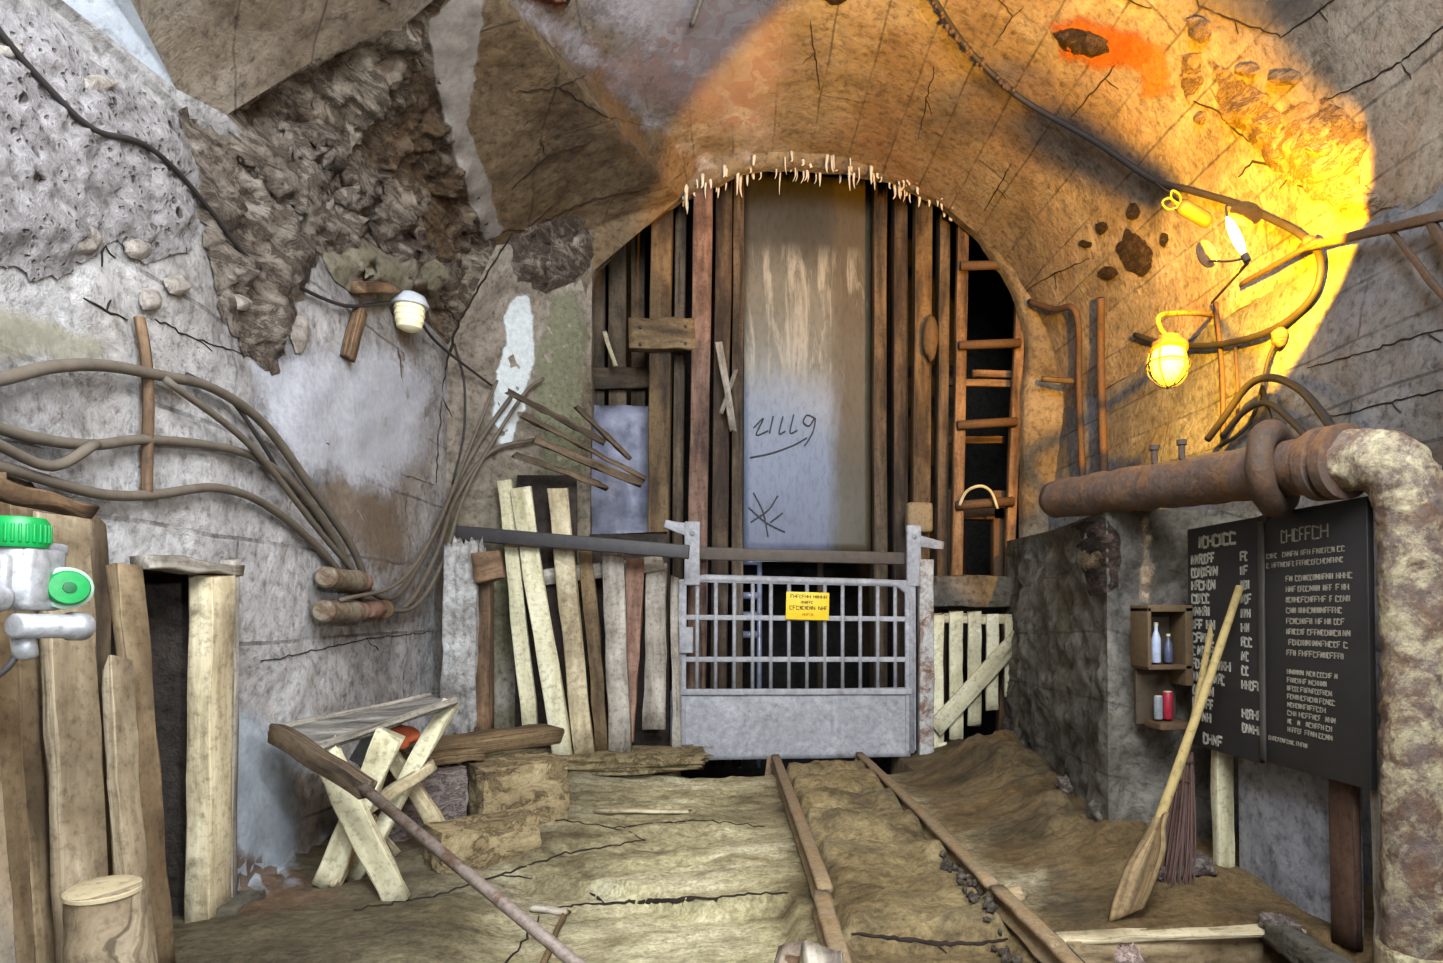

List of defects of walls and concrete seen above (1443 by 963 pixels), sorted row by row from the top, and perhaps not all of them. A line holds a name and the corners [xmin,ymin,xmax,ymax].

spalling [0,9,476,376]
spalling [1052,28,1109,58]